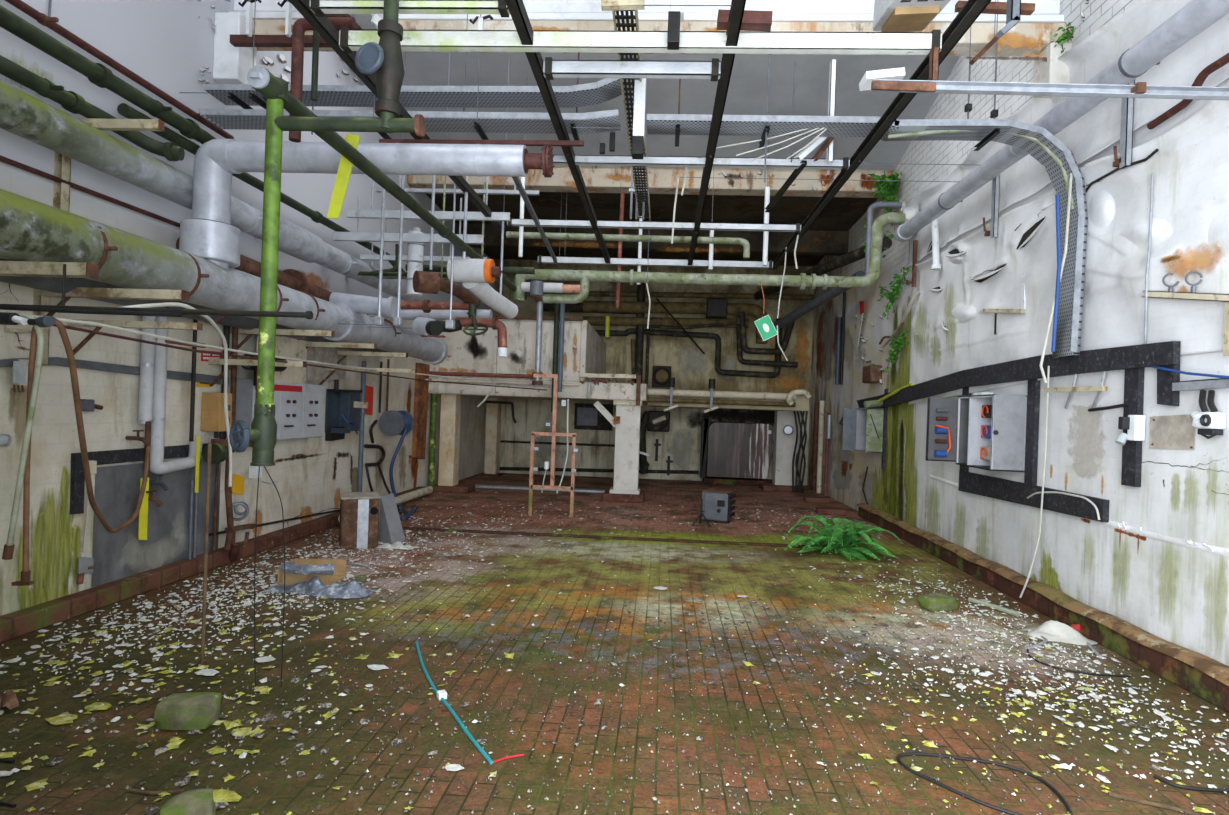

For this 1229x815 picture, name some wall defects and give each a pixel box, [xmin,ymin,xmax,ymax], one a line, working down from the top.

rust [861,173,879,190]
rust [1163,249,1220,292]
damp [891,298,911,389]
damp [828,402,917,526]
damp [17,513,47,610]
damp [61,468,81,591]